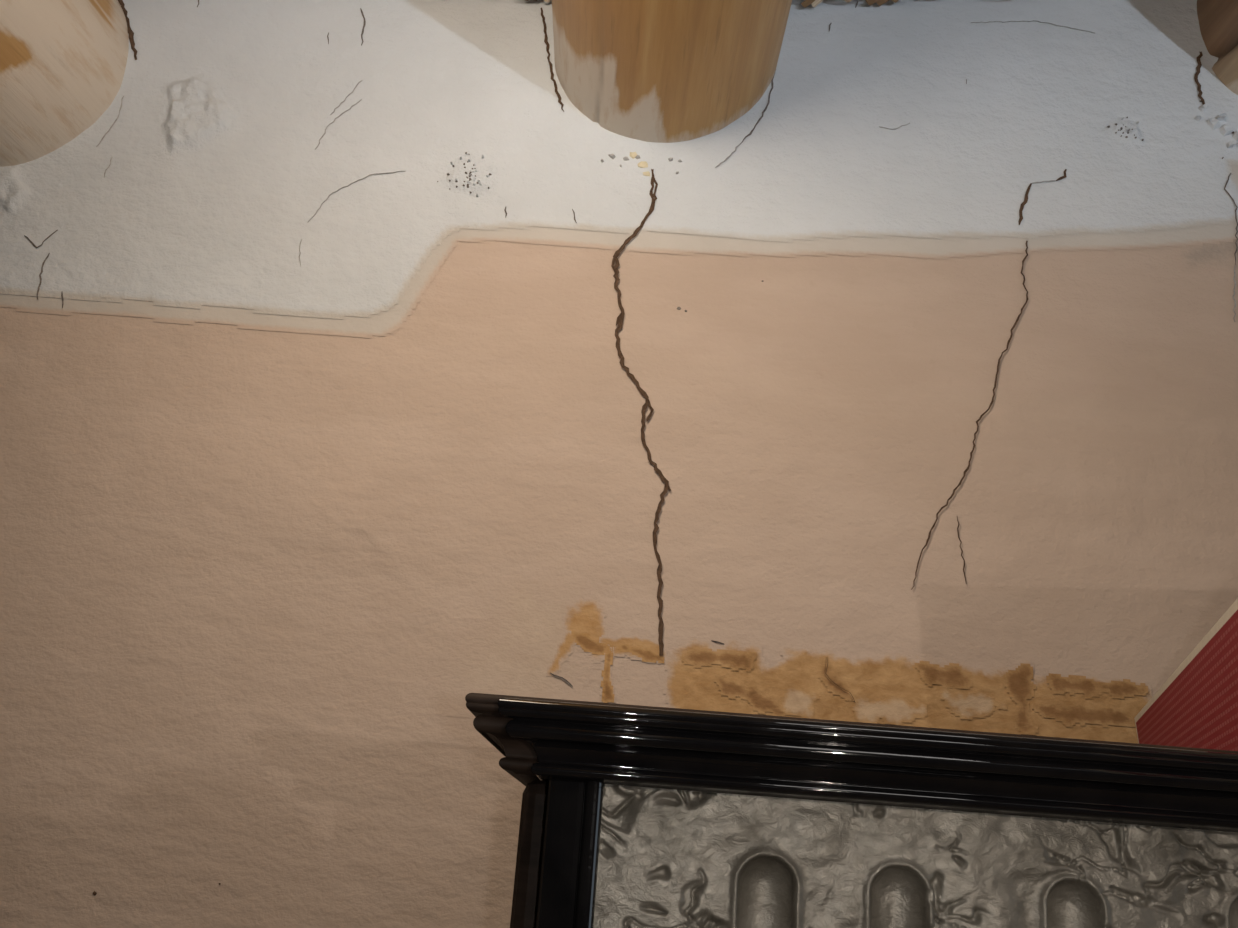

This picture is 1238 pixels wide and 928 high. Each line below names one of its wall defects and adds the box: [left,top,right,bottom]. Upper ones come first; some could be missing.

crack [611,169,671,656]
crack [911,169,1067,590]
crack [1224,173,1238,322]
peeling [663,637,1153,744]